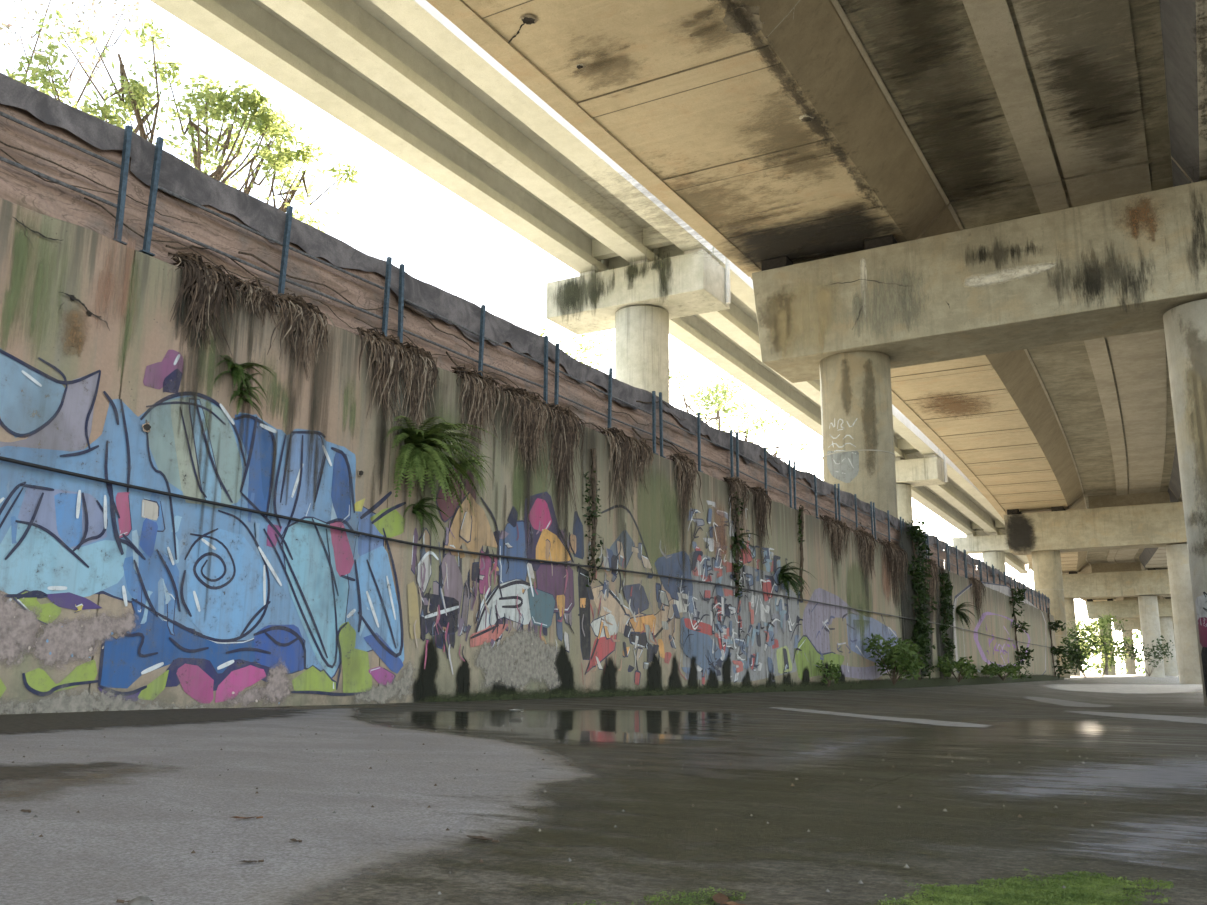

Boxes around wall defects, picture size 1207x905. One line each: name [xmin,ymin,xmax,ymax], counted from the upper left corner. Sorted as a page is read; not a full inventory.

water stain [718,0,921,332]
rust [1126,199,1156,241]
crack [59,292,110,331]
water stain [557,257,670,317]
water stain [966,244,1144,301]
rust [921,393,985,416]
peeling [0,592,136,670]
peeling [475,630,560,690]
peeling [0,664,291,715]